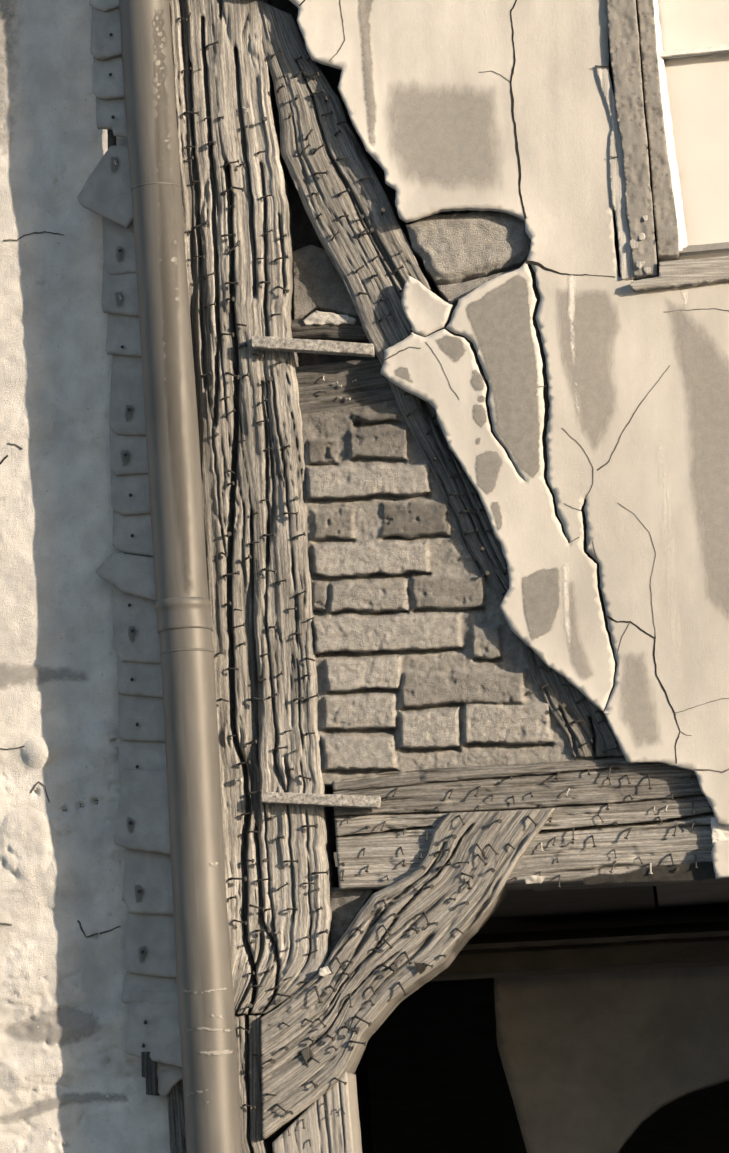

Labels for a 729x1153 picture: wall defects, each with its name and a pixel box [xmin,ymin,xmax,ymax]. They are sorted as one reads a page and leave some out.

crack [329,0,345,61]
damp [358,0,376,143]
damp [393,89,494,182]
spalling [405,211,531,304]
crack [479,0,526,219]
peeling [595,65,651,281]
crack [384,260,729,773]
damp [677,292,729,612]